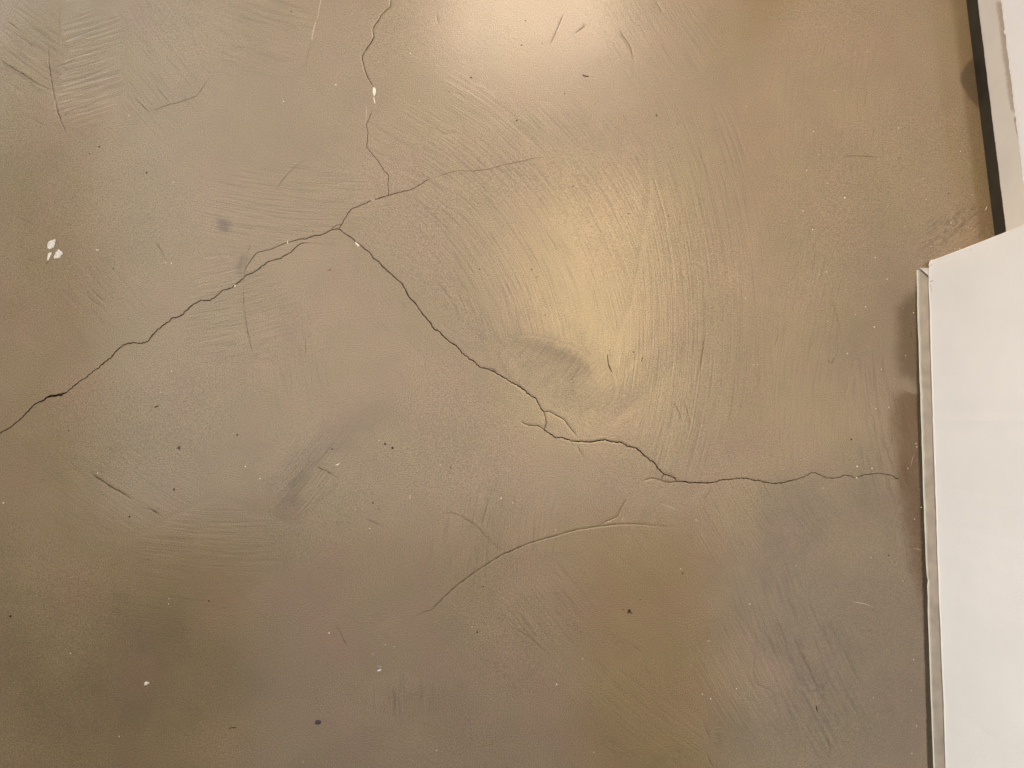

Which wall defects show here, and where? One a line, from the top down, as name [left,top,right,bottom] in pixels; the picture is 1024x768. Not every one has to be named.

crack [362,1,391,86]
crack [48,50,66,132]
crack [0,112,916,484]